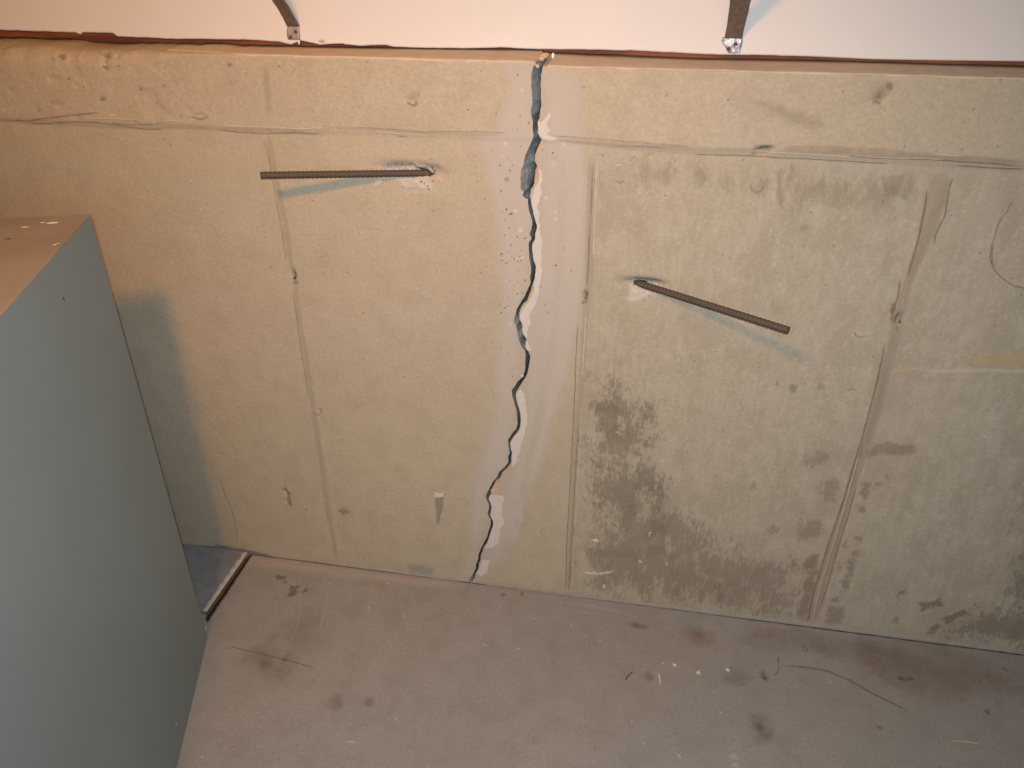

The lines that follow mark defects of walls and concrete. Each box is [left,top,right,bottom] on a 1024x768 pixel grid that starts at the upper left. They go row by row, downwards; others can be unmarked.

peeling [485,495,505,549]
crack [472,52,555,581]
peeling [510,389,528,466]
water stain [568,372,820,619]